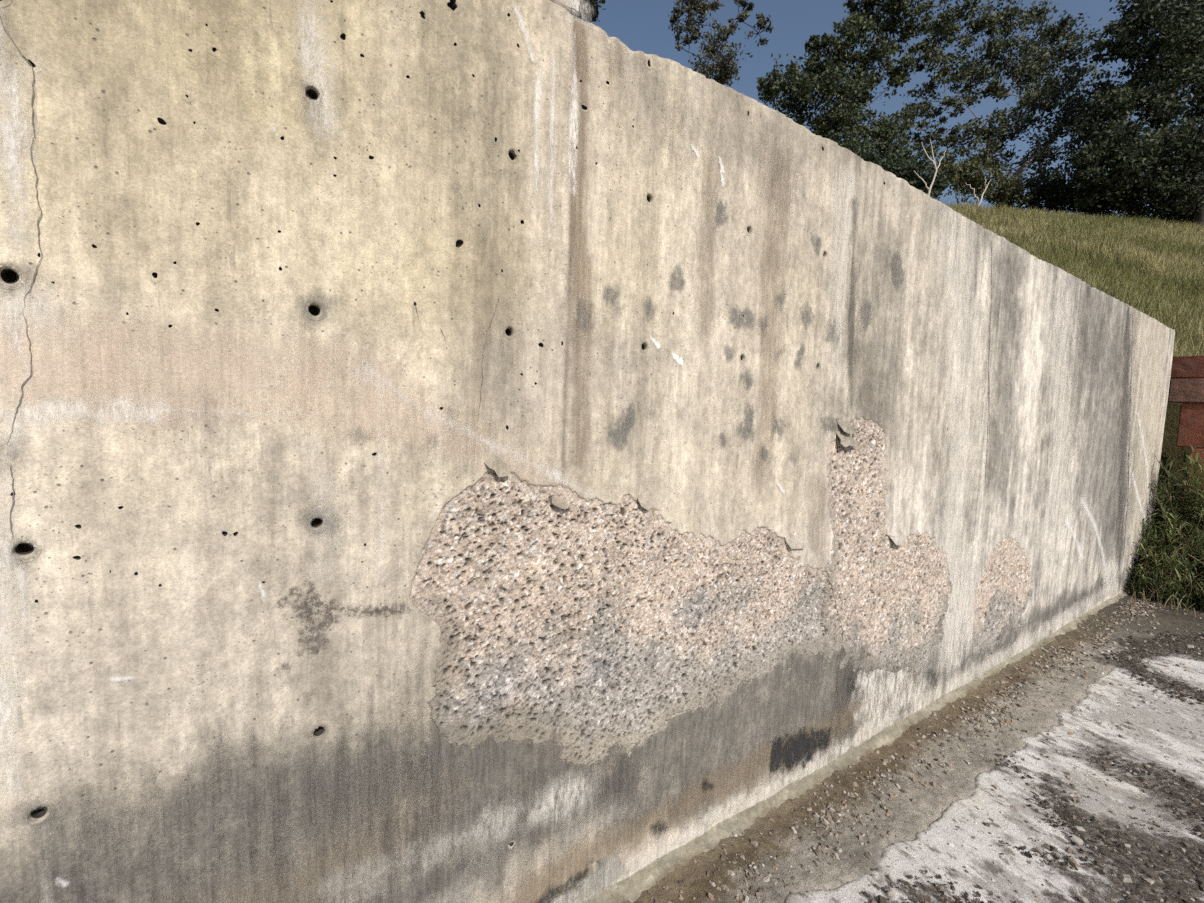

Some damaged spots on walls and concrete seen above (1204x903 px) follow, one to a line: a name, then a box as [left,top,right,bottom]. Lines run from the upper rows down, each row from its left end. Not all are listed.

crack [0,15,42,543]
water stain [671,266,684,289]
water stain [717,203,727,223]
water stain [830,173,870,372]
water stain [891,254,902,285]
water stain [0,297,1166,903]
peeling [277,417,953,769]
peeling [971,537,1033,662]